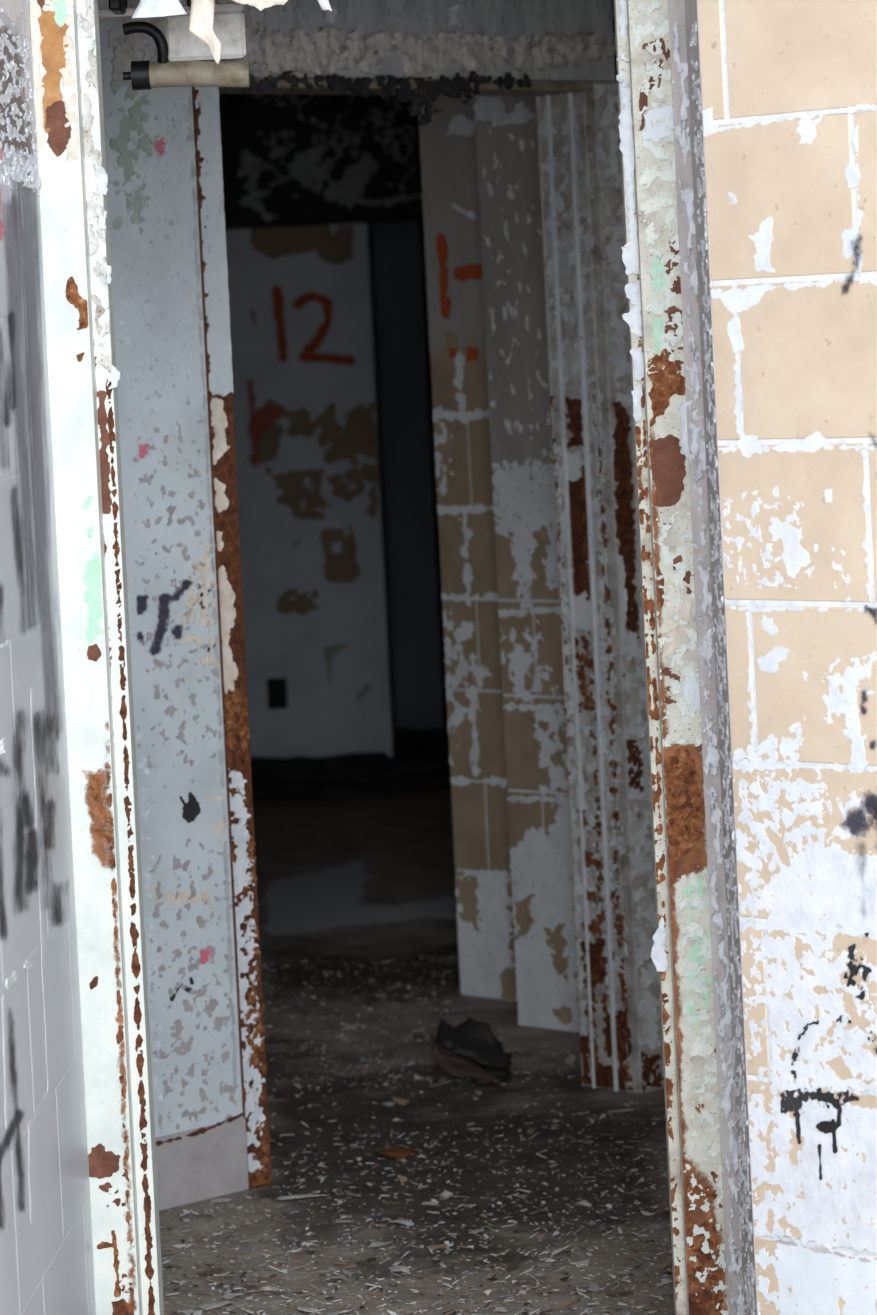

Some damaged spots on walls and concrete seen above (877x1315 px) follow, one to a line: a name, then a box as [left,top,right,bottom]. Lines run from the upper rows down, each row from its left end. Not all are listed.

corrosion [45,100,71,157]
corrosion [639,38,670,131]
corrosion [65,276,88,330]
peeling [136,684,218,775]
corrosion [225,689,250,754]
corrosion [550,240,728,1315]
corrosion [76,352,156,1315]
peeling [141,753,266,1173]
corrosion [245,836,267,1073]
corrosion [252,1119,272,1186]